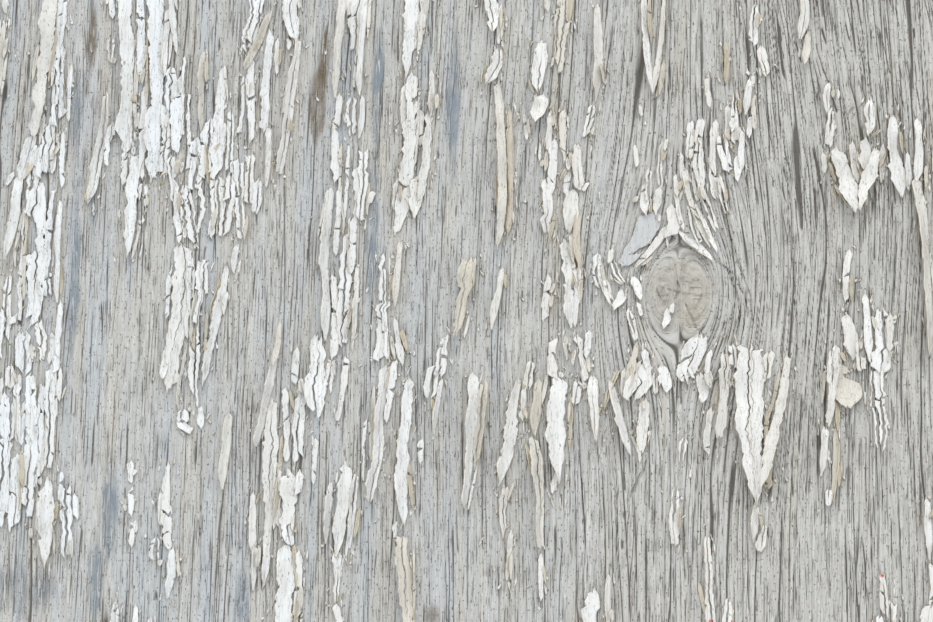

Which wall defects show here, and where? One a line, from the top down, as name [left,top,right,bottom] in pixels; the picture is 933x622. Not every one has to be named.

peeling [0,0,79,580]
peeling [83,0,309,490]
peeling [238,0,508,622]
peeling [475,0,797,622]
peeling [811,245,900,512]
peeling [820,79,933,356]
peeling [110,592,156,622]
peeling [120,458,186,606]
peeling [872,573,905,622]
peeling [918,482,933,622]